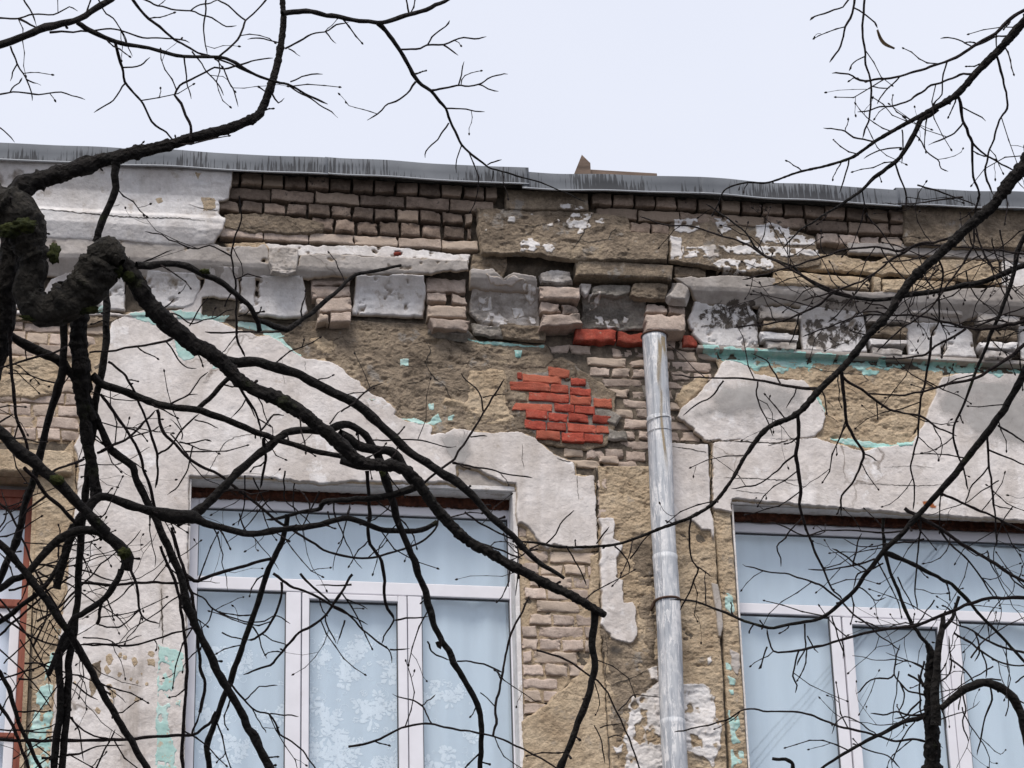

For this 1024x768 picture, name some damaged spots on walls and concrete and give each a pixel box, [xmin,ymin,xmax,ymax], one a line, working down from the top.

flaking render [0,315,80,768]
flaking render [87,305,156,397]
peeling [547,203,605,234]
spalling [172,217,1020,768]